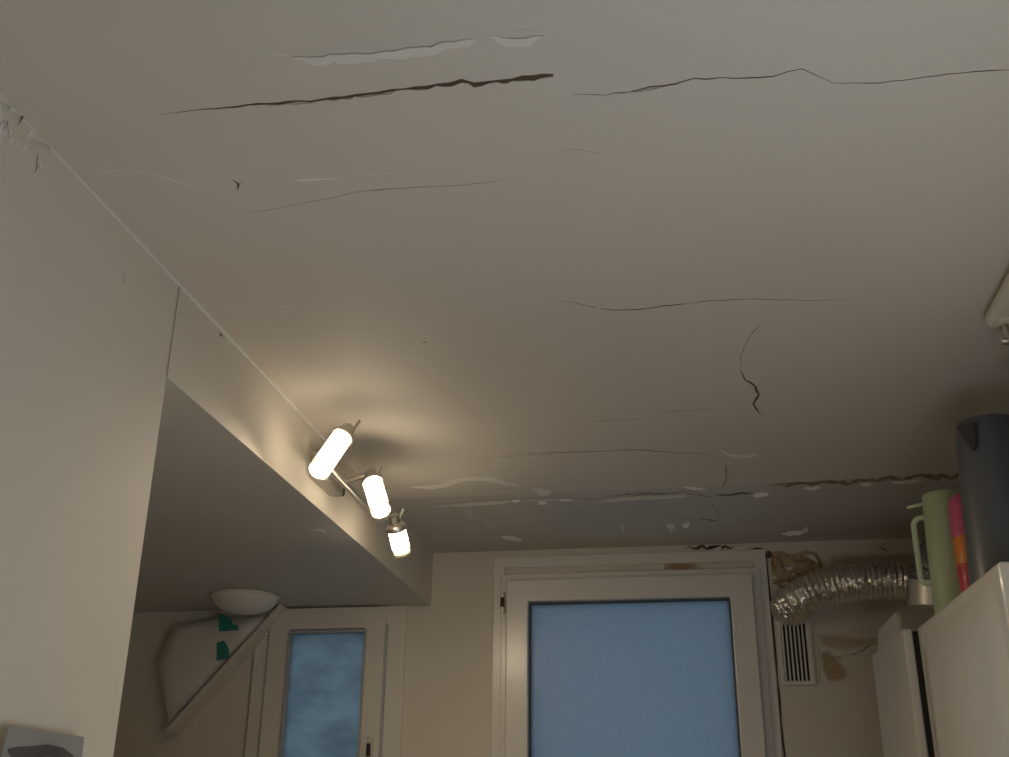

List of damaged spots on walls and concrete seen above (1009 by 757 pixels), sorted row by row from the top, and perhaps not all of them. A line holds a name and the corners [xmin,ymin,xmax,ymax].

peeling [248,38,475,67]
crack [161,74,554,115]
crack [580,68,1003,96]
crack [252,180,504,213]
crack [560,299,853,313]
crack [740,325,761,415]
crack [423,449,959,521]
crack [685,544,786,757]